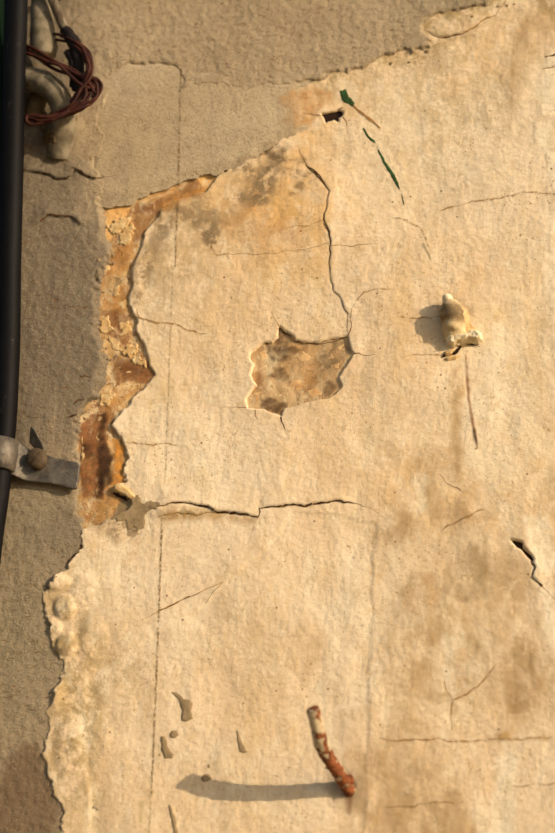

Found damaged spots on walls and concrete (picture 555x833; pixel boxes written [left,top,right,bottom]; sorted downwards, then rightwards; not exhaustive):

spalling [32,167,116,180]
crack [211,149,374,331]
flaking render [67,180,202,528]
crack [137,312,205,334]
flaking render [238,309,374,428]
crack [157,500,379,519]
crack [511,540,555,599]
rust [306,705,356,797]